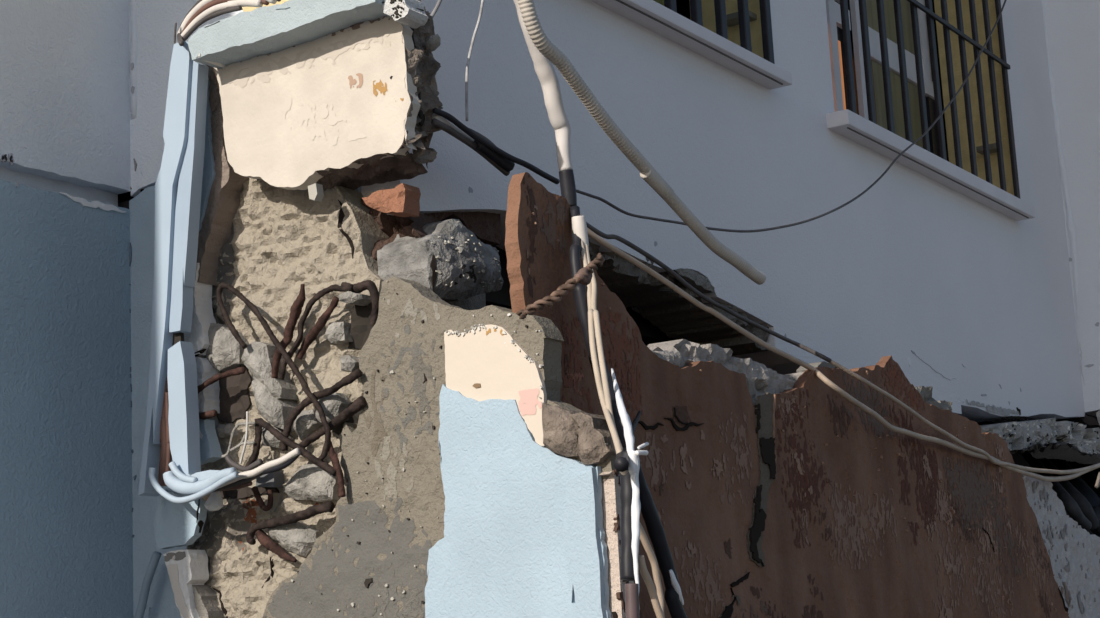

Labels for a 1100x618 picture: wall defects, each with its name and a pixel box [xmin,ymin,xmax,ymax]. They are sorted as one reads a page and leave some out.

spalling [163,65,584,618]
crack [631,408,704,431]
crack [719,392,777,618]
spalling [1026,410,1100,452]